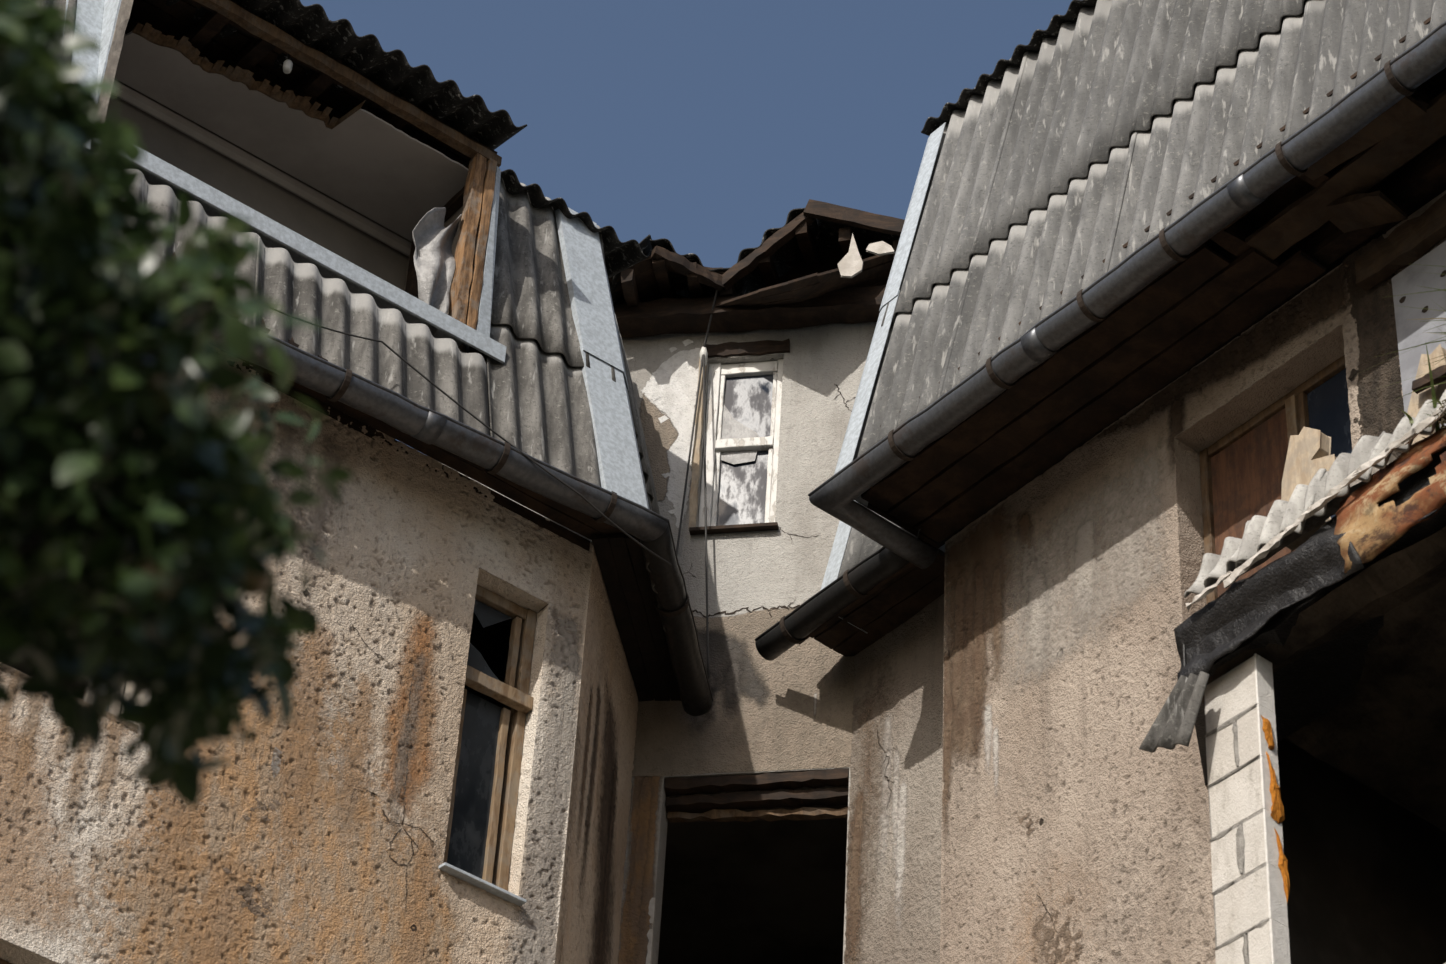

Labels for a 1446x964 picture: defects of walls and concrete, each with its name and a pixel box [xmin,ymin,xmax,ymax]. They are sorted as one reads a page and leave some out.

peeling [640,339,701,528]
damp [57,728,90,809]
damp [99,719,121,796]
corrosion [87,615,459,964]
crack [339,623,435,897]